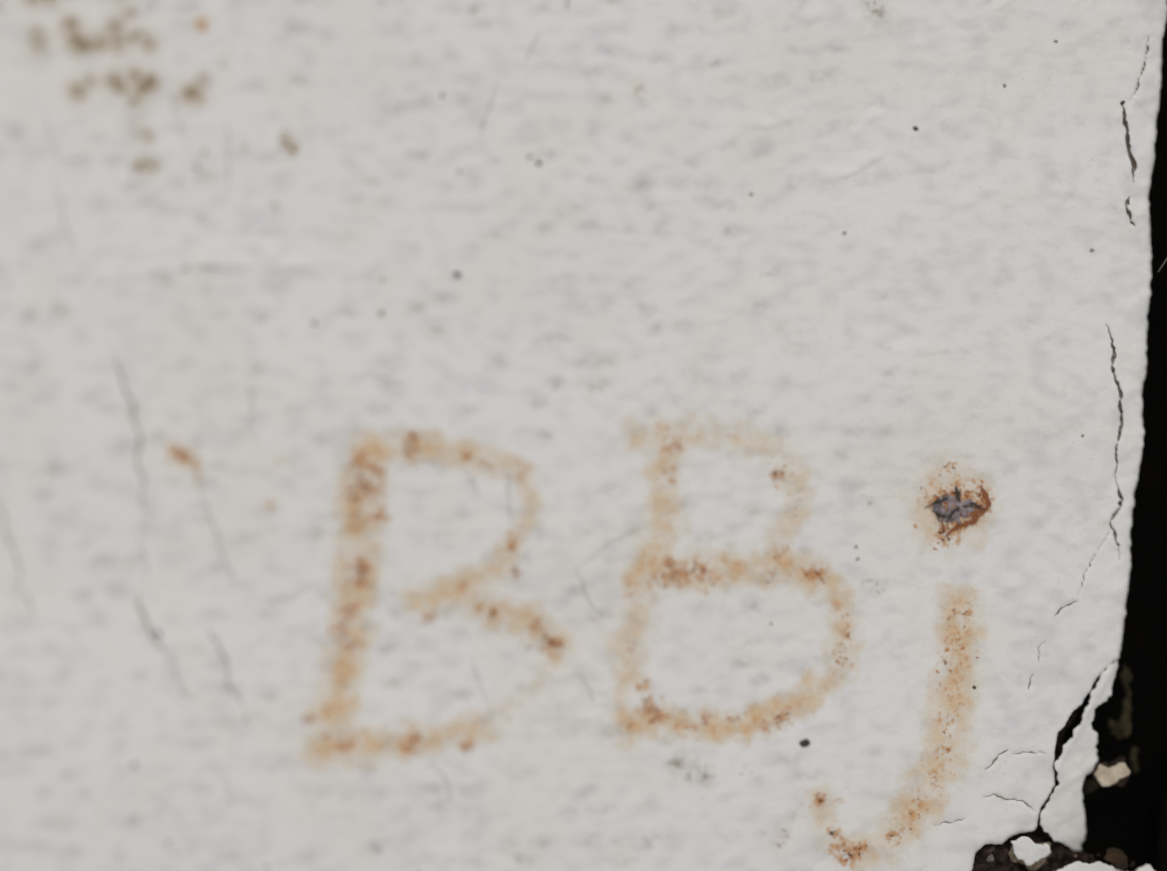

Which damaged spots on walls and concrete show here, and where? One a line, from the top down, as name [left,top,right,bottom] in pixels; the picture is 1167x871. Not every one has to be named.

damp [61,0,160,142]
crack [1122,37,1149,226]
rust [302,430,538,764]
rust [399,498,565,666]
rust [616,418,854,743]
rust [914,461,994,550]
crack [1056,324,1123,615]
rust [794,597,979,868]
peeling [972,660,1154,871]